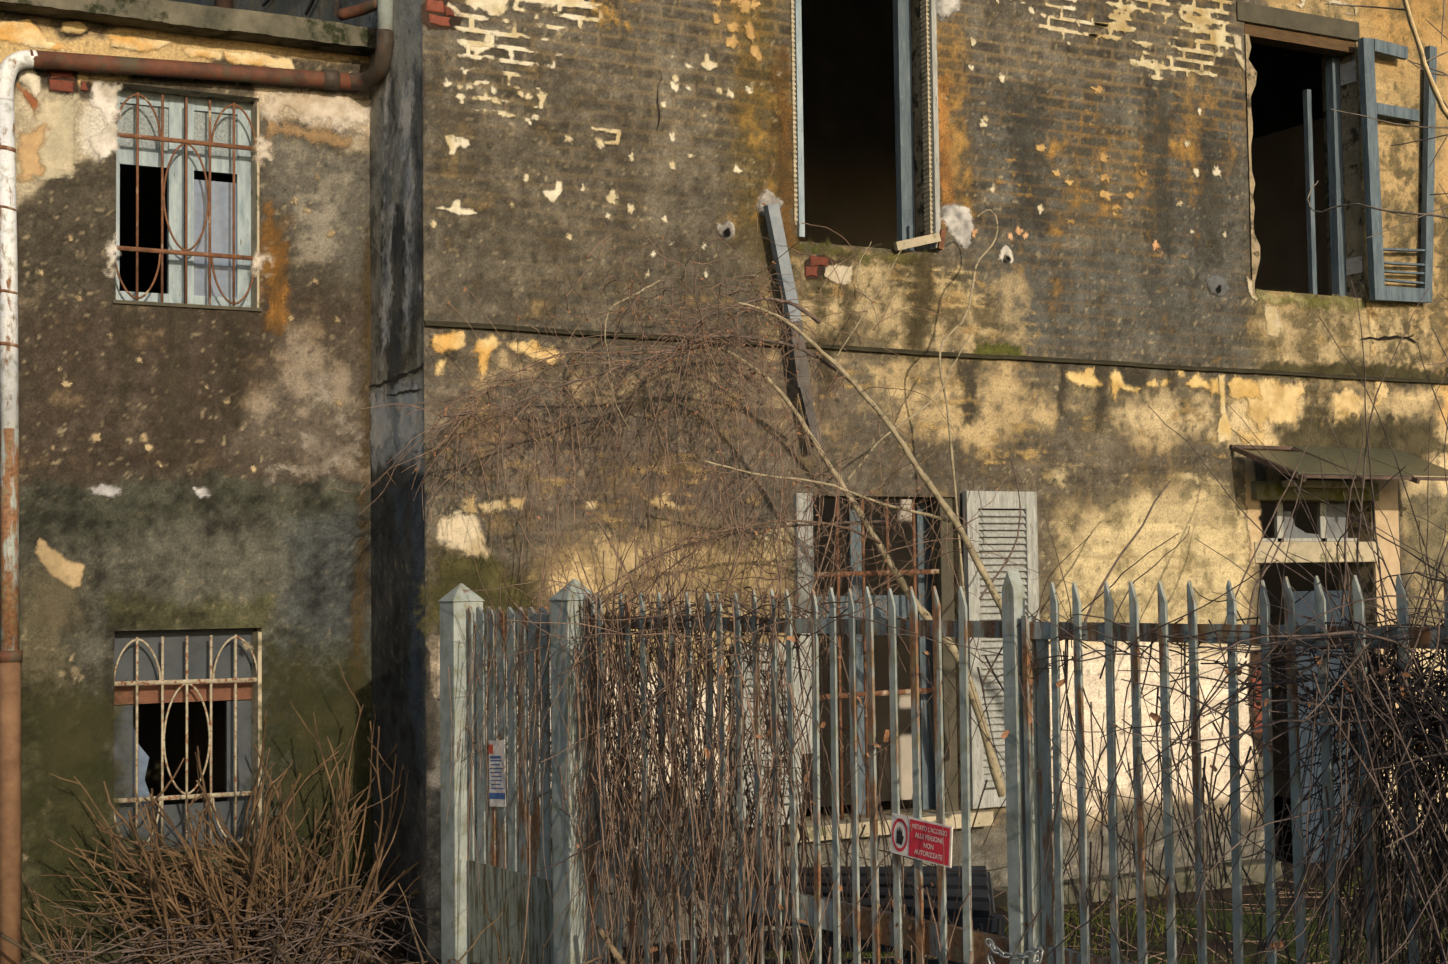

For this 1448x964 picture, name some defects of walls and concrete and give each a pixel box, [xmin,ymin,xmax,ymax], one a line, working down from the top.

peeling [16,68,121,182]
peeling [109,36,294,69]
corrosion [264,203,289,334]
peeling [259,77,476,367]
damp [365,61,424,383]
peeling [420,0,603,125]
damp [910,256,933,351]
damp [1145,74,1177,257]
peeling [1021,0,1302,338]
damp [1058,122,1448,442]
damp [957,358,981,424]
peeling [437,495,525,559]